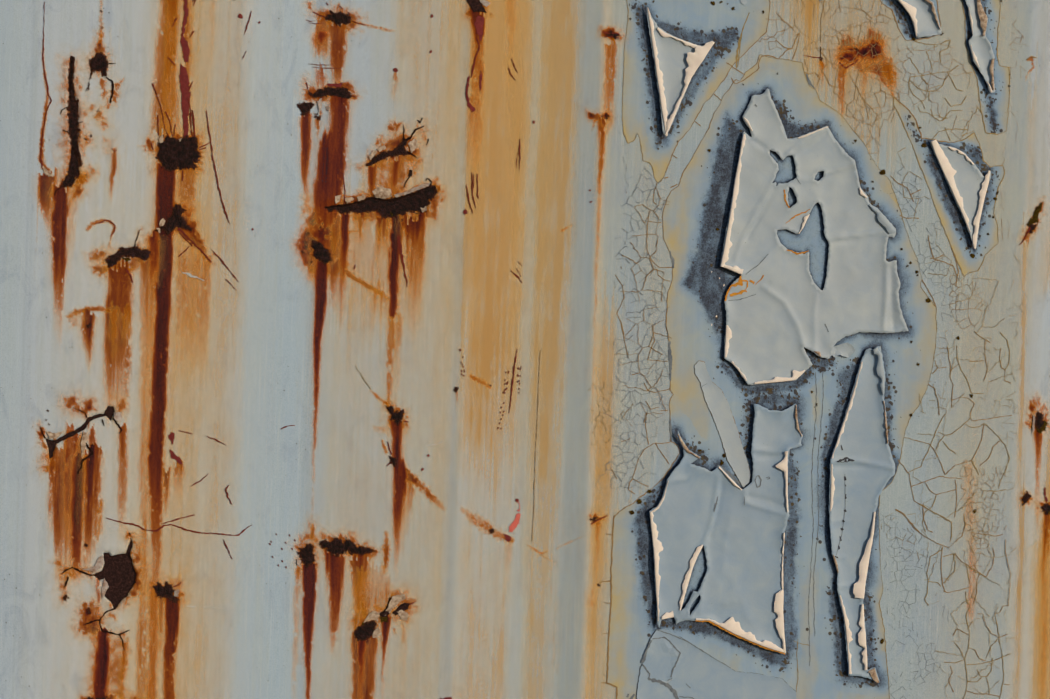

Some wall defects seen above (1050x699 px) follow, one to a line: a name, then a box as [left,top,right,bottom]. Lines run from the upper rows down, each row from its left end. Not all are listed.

corrosion [109,148,117,194]
corrosion [307,2,388,84]
corrosion [587,27,622,203]
corrosion [836,29,896,110]
peeling [893,0,1011,277]
corrosion [130,0,212,699]
corrosion [294,207,388,449]
corrosion [269,365,442,699]
crack [588,132,677,699]
peeling [607,0,944,699]
crack [714,0,1030,699]
corrosion [1020,488,1050,597]